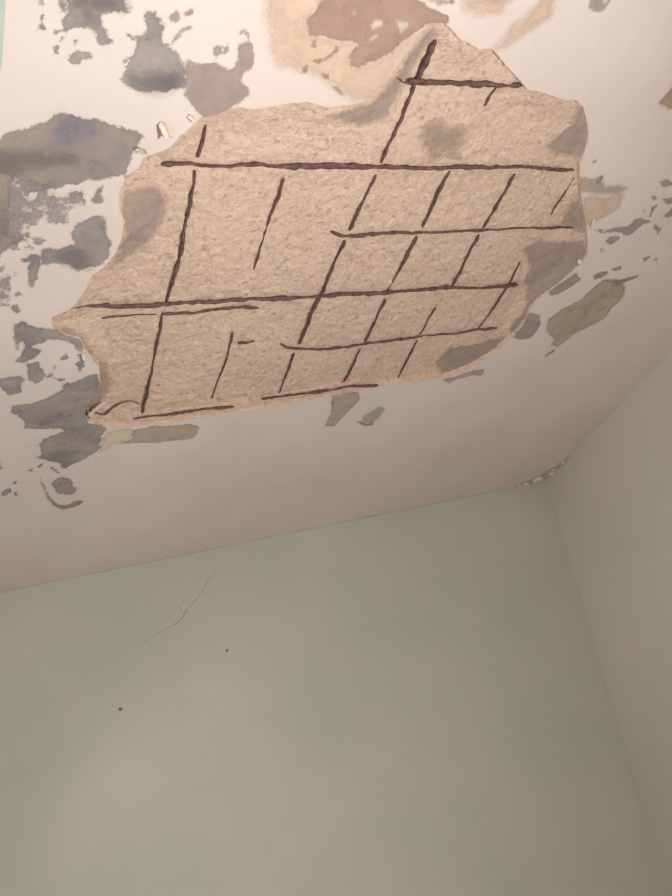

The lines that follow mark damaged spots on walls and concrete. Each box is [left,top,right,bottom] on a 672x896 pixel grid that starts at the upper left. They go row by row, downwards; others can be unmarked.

peeling [589,0,610,11]
spalling [0,0,589,473]
peeling [598,196,672,253]
leakage [42,477,83,509]